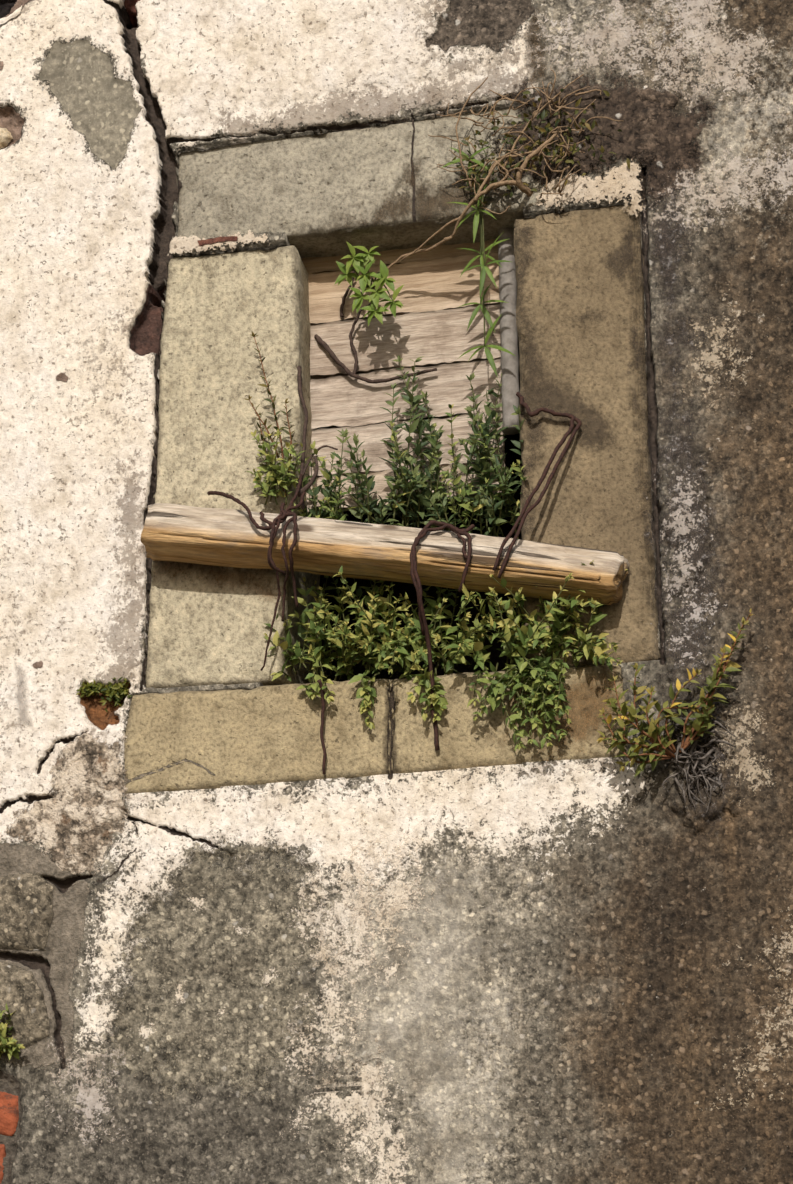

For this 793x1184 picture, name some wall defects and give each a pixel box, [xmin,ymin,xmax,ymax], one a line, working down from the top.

spalling [0,0,31,25]
peeling [425,0,535,53]
spalling [0,106,25,150]
crack [104,0,523,300]
crack [143,354,160,523]
leakage [345,0,793,824]
crack [0,731,87,813]
crack [43,758,232,894]
spalling [0,677,136,1184]
leakage [48,1034,133,1149]
leakage [279,811,435,1184]
leakage [711,907,793,1110]